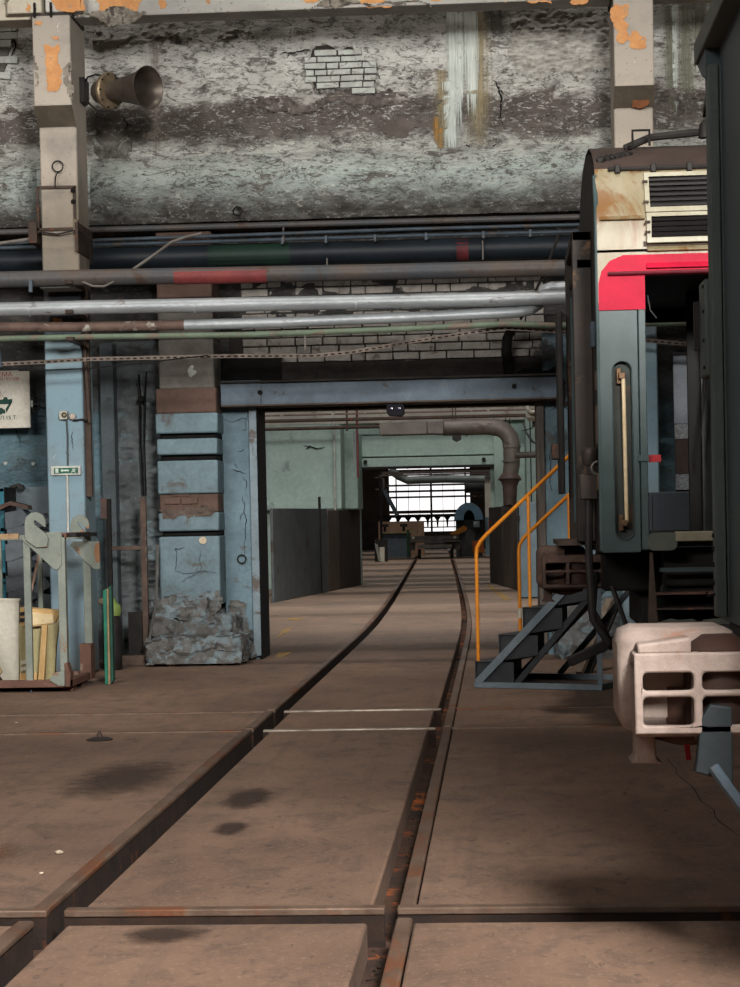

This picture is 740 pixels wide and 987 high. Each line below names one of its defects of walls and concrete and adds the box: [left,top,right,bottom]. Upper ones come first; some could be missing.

flaking render [0,28,19,80]
spalling [2,105,35,115]
peeling [33,36,74,100]
spalling [51,0,255,49]
flaking render [236,43,443,115]
spalling [304,0,441,11]
spalling [381,117,421,138]
water stain [438,10,504,148]
spalling [507,0,647,83]
flaking render [112,341,250,655]